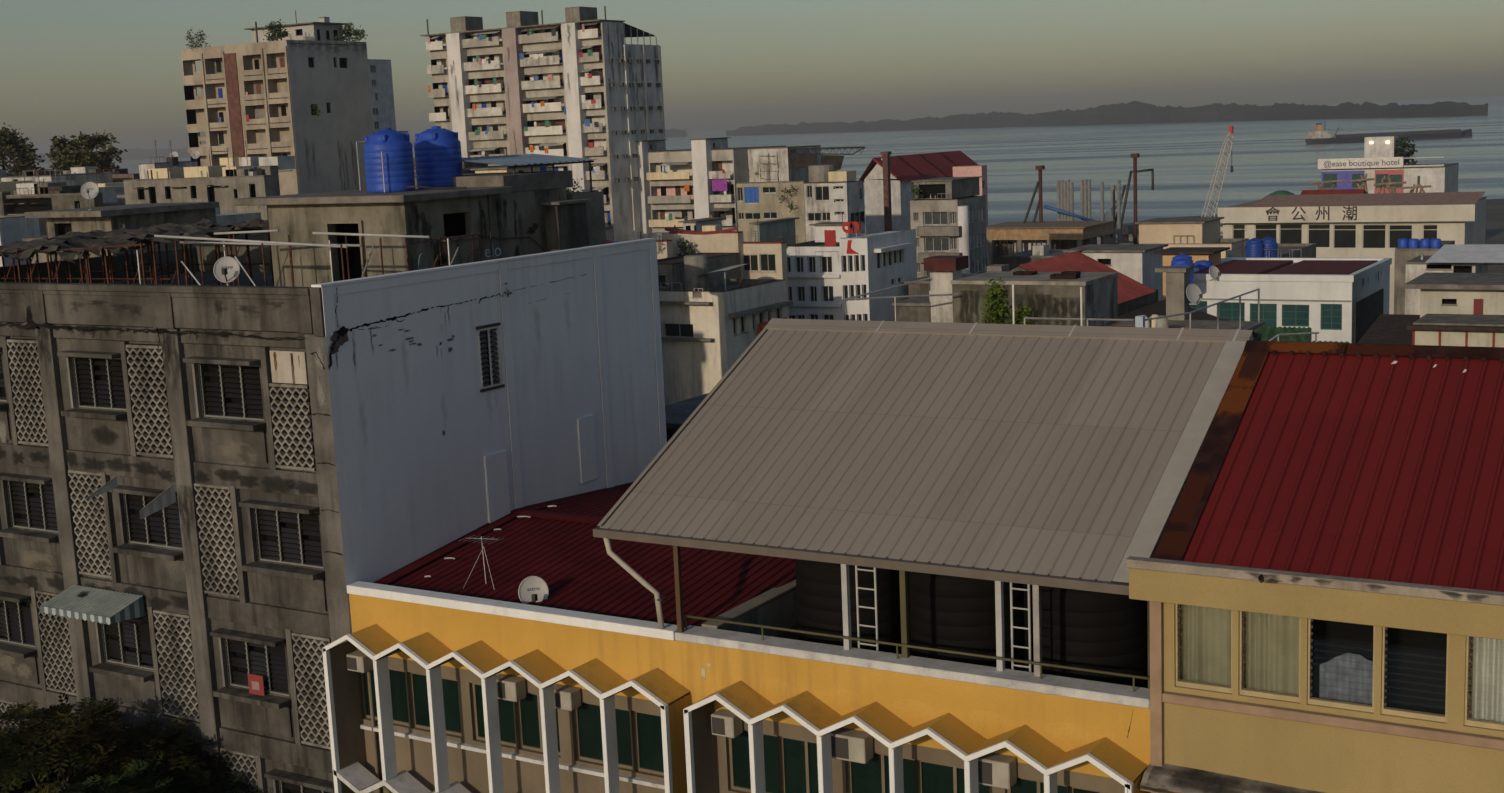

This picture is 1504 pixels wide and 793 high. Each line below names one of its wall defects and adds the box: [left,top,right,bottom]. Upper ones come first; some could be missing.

crack [0,274,586,349]
rust [1155,472,1212,557]